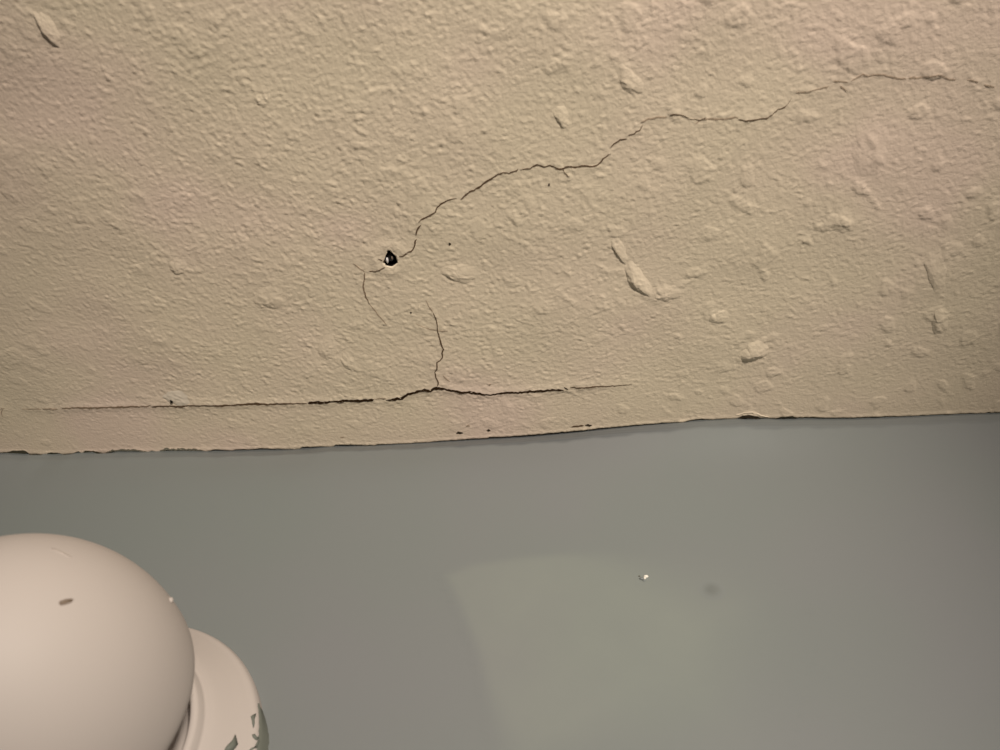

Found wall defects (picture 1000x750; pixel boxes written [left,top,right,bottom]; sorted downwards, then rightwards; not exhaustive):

crack [354,74,993,324]
crack [28,301,631,410]